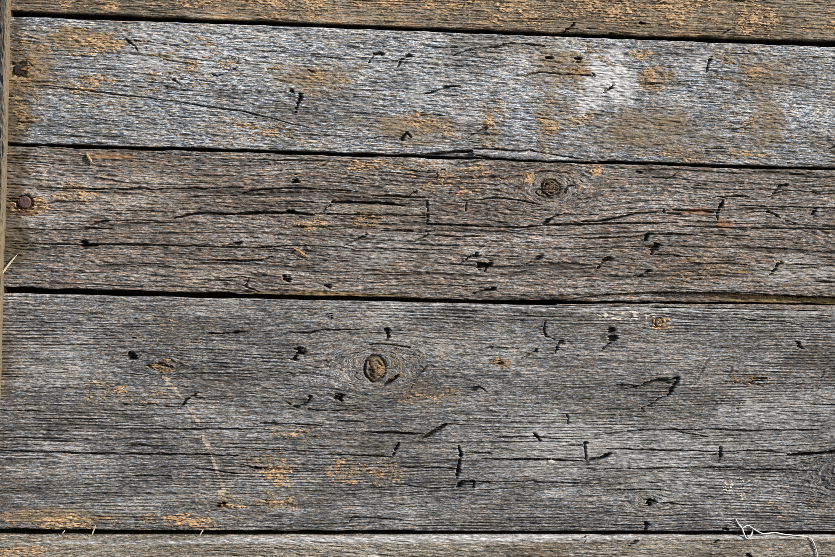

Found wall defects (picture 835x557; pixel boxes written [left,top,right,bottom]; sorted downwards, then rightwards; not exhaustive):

crack [174,187,313,219]
crack [331,190,440,239]
crack [461,195,743,241]